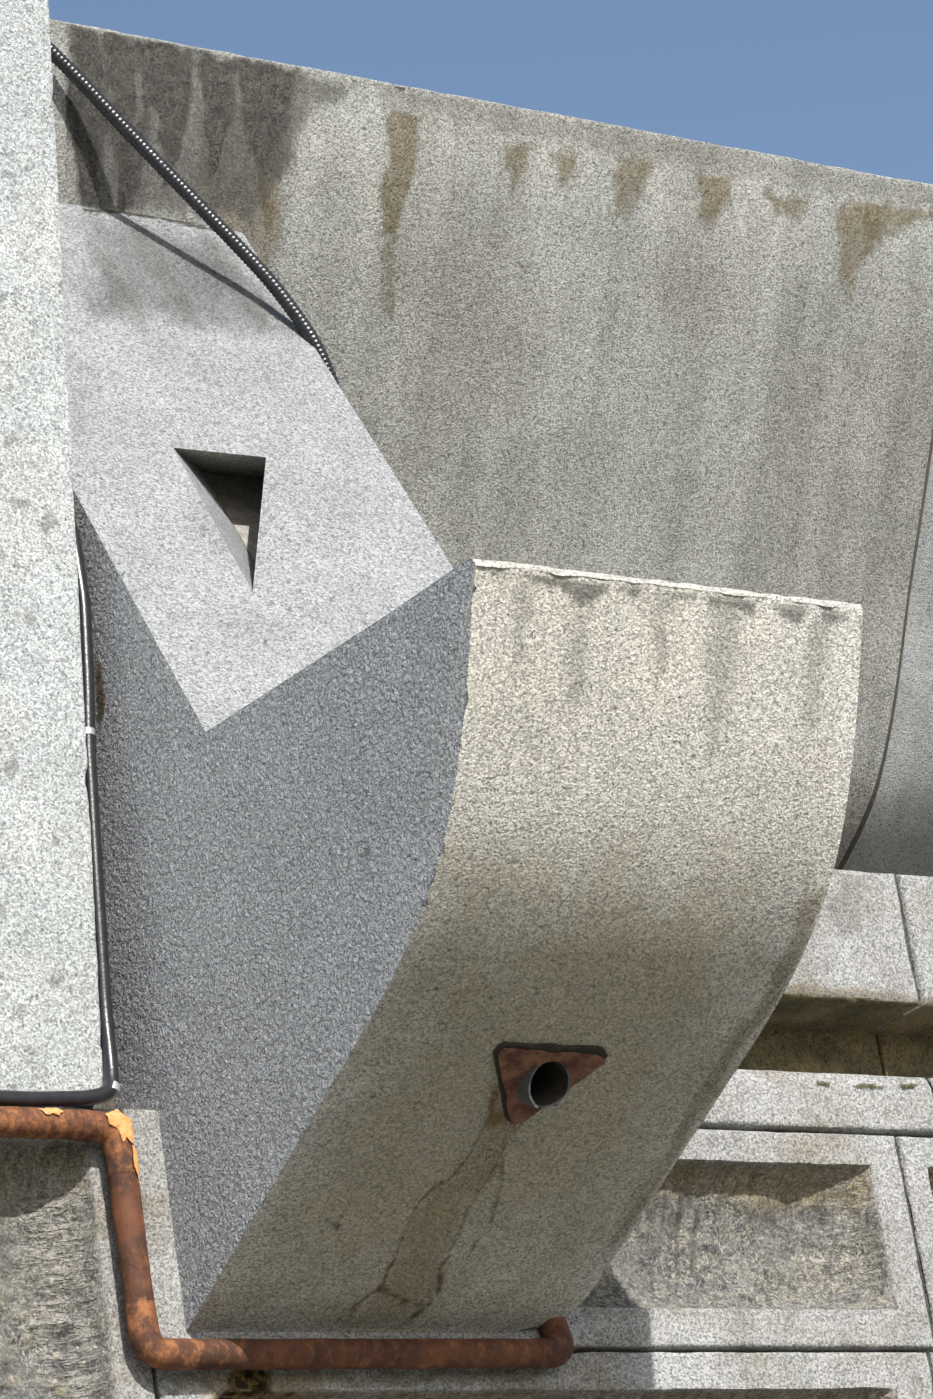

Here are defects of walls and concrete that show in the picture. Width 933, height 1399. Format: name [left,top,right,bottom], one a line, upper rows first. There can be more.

leakage [67,24,298,224]
leakage [383,111,418,231]
leakage [510,145,528,183]
leakage [699,175,728,218]
leakage [838,203,923,282]